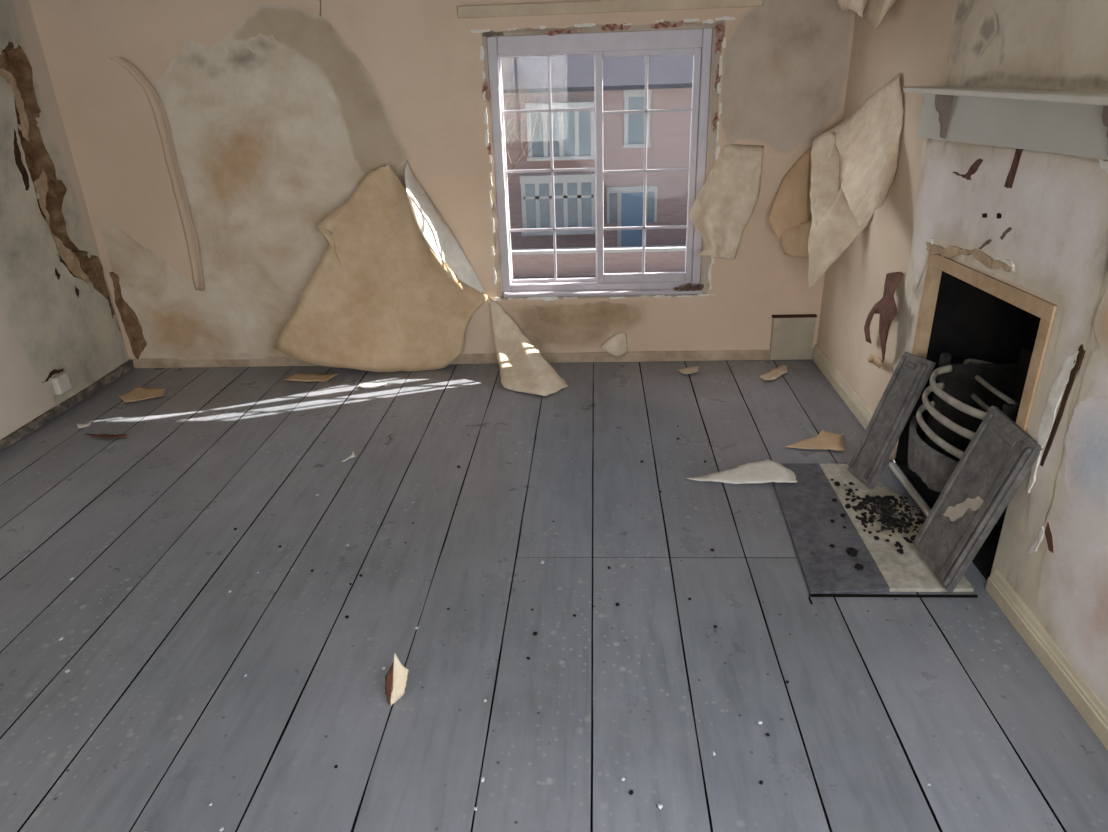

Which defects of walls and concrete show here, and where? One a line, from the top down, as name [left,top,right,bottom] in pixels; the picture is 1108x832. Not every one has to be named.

crack [0,37,147,359]
peeling [0,0,411,407]
damp [172,33,329,274]
spalling [471,16,735,353]
peeling [945,0,1108,91]
damp [961,68,1108,93]
damp [134,296,268,360]
damp [535,301,630,329]
peeling [891,138,1108,709]
crack [1027,344,1086,493]
crack [1027,522,1053,554]